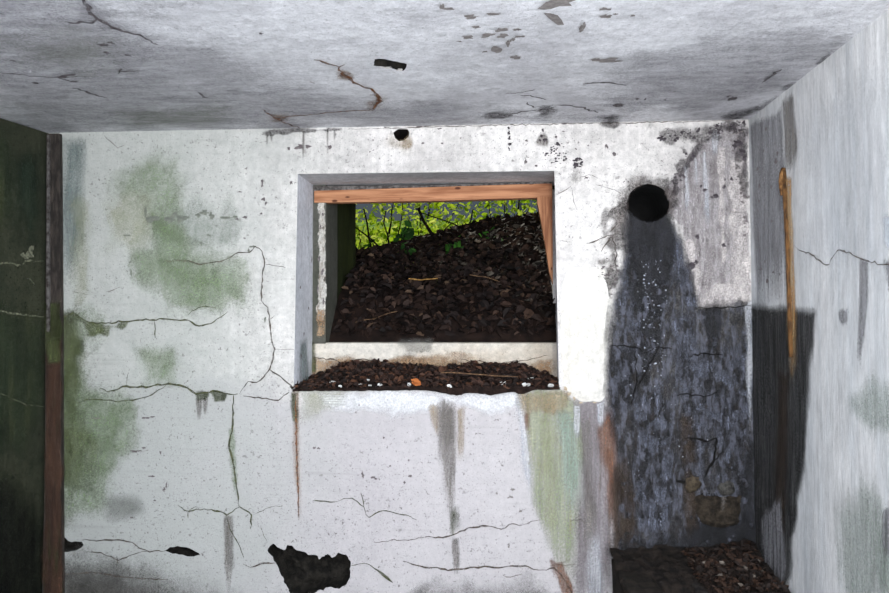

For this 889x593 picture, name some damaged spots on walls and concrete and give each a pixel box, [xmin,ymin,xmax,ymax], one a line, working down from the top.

crack [65,0,158,45]
crack [3,73,106,98]
spalling [374,59,407,71]
water stain [660,84,797,287]
corrosion [786,179,795,338]
crack [795,246,889,266]
water stain [301,343,351,380]
water stain [387,349,470,366]
crack [65,246,574,593]
water stain [518,211,815,593]
water stain [431,401,462,568]
spalling [268,544,351,593]